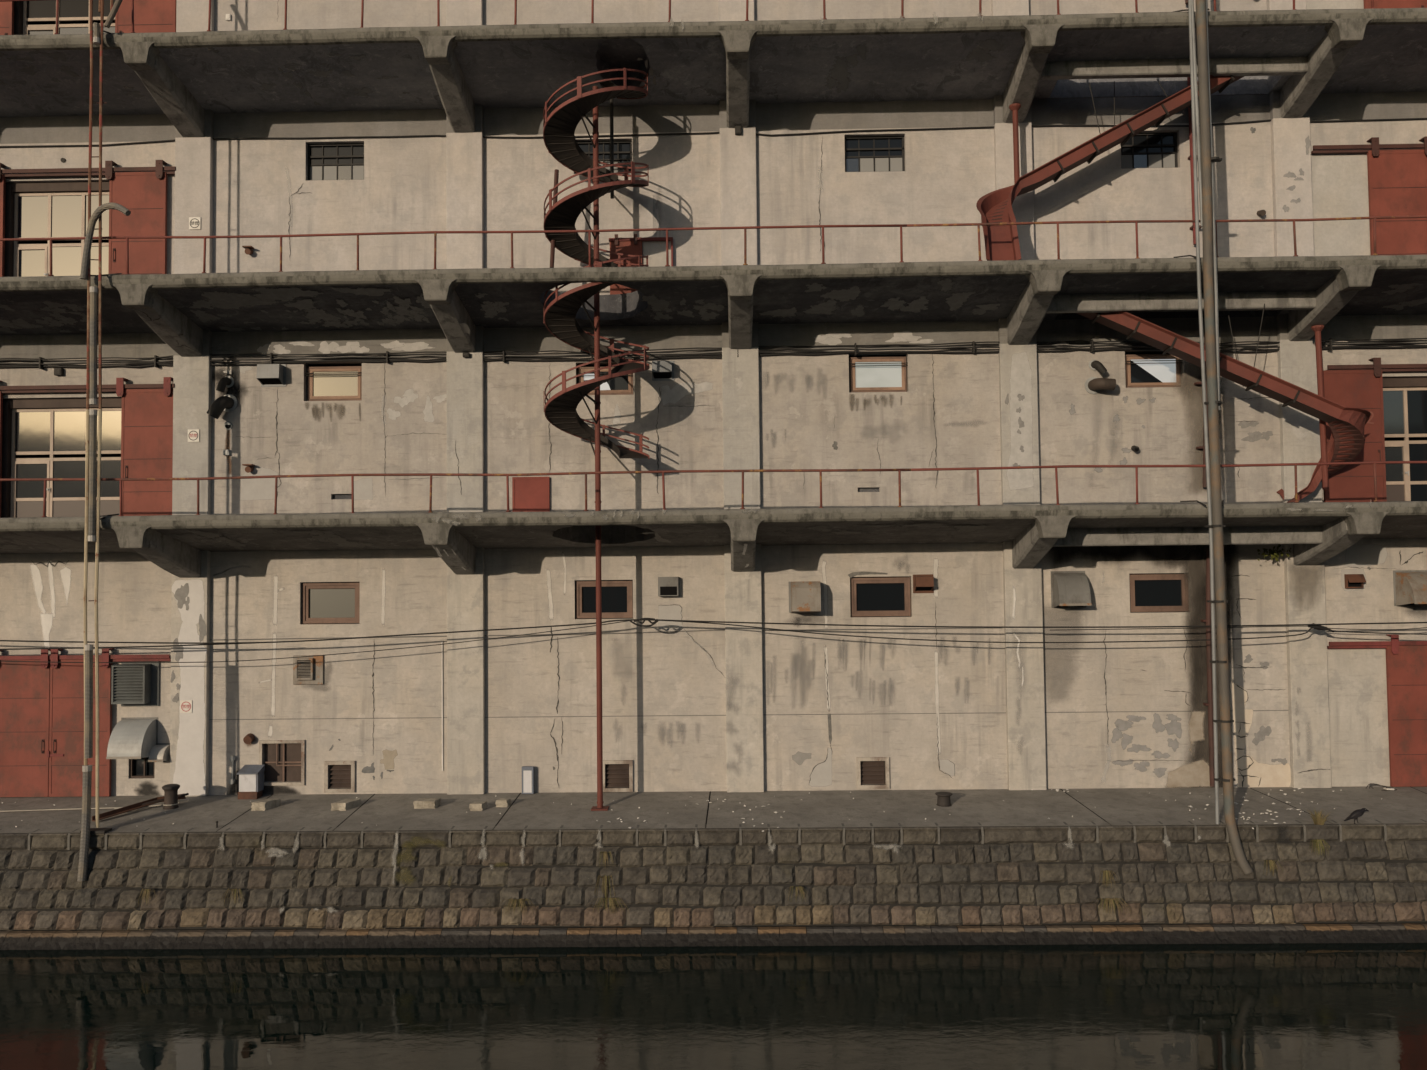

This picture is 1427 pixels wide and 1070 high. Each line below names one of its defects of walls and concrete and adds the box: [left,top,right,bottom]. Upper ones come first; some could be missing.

crack [546,553,567,786]
leakage [1052,545,1234,788]
peeling [1112,681,1318,829]